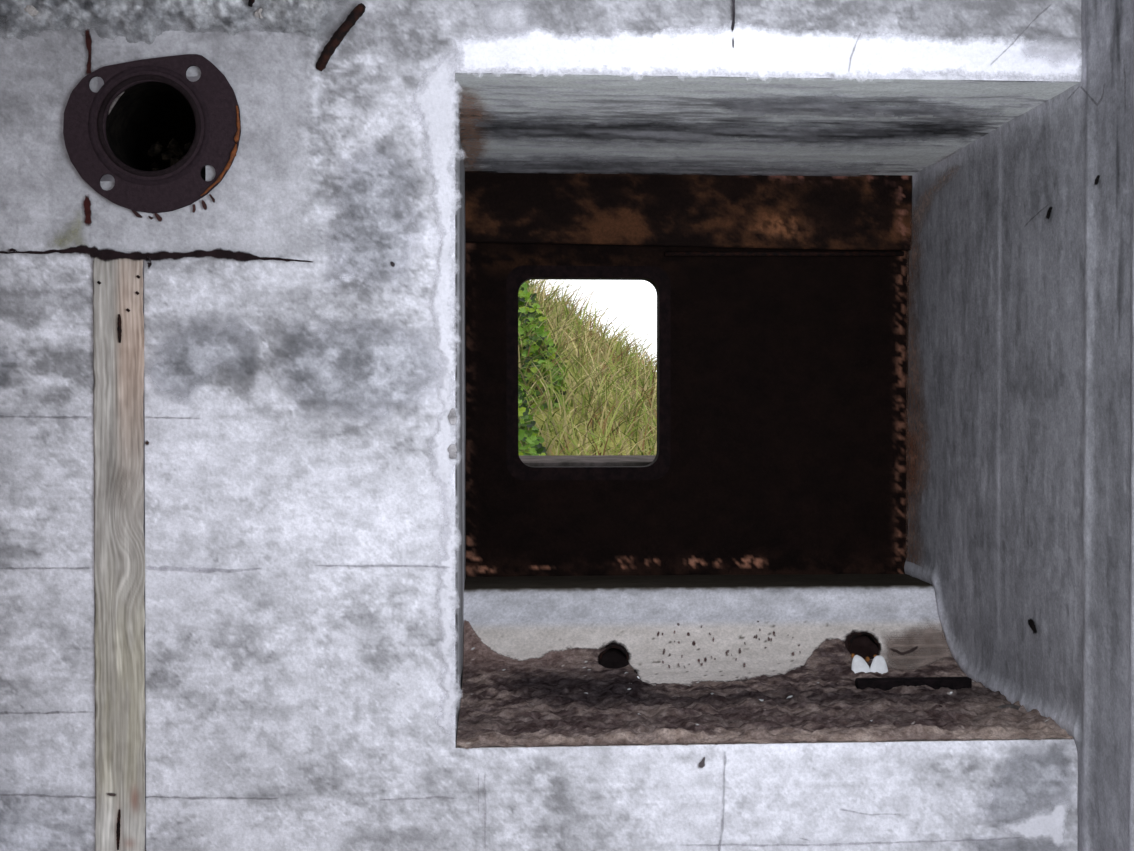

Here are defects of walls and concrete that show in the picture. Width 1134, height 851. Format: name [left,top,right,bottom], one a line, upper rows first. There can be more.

crack [729,0,737,48]
corrosion [192,106,240,213]
crack [0,245,313,269]